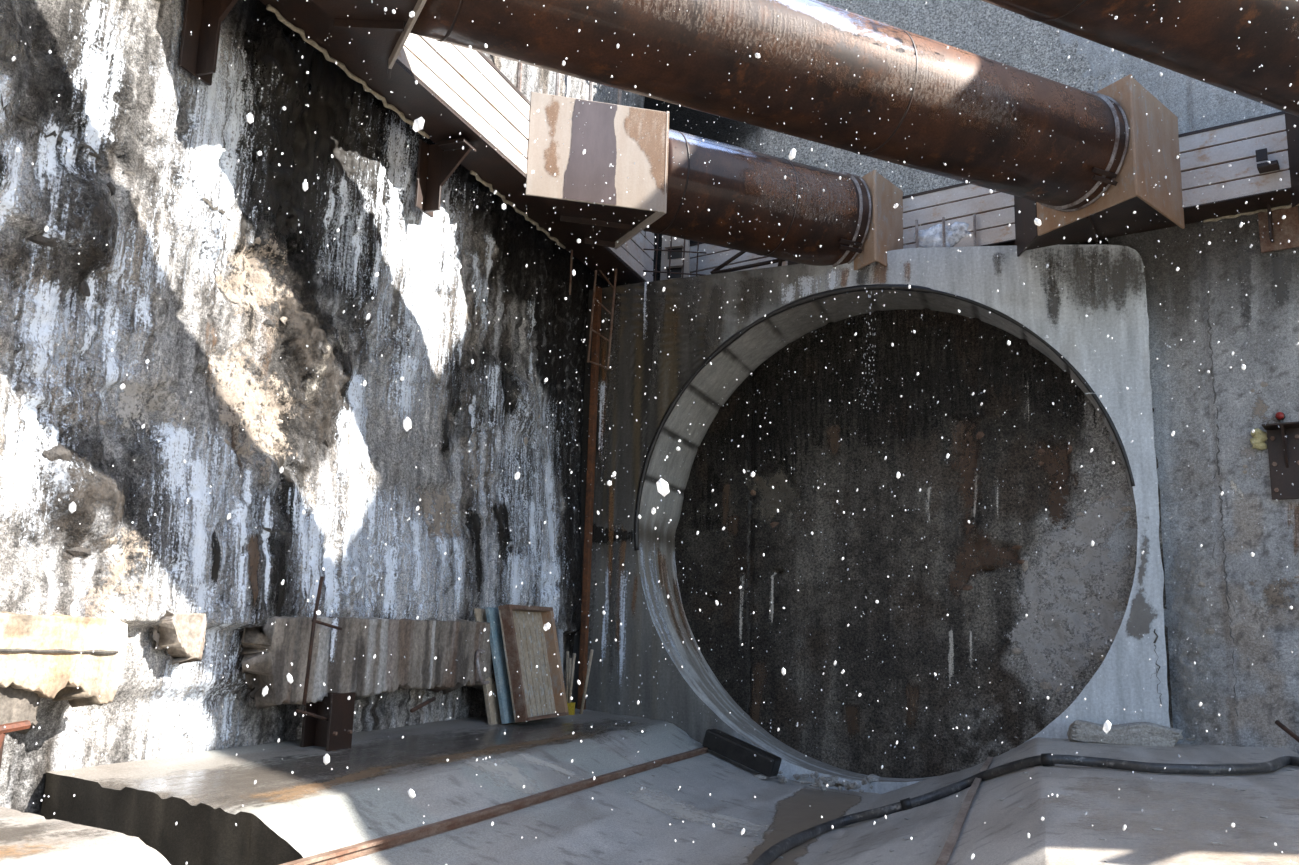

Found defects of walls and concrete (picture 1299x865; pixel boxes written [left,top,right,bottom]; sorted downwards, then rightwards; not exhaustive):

leakage [563,99,617,205]
spalling [215,226,299,343]
leakage [1030,245,1146,324]
leakage [1270,254,1292,306]
leakage [0,0,574,760]
leakage [686,265,1114,534]
crack [1206,256,1238,716]
leakage [587,524,685,685]
corrosion [750,658,768,725]
leakage [769,572,777,621]
leakage [948,630,973,680]
leakage [95,719,645,813]